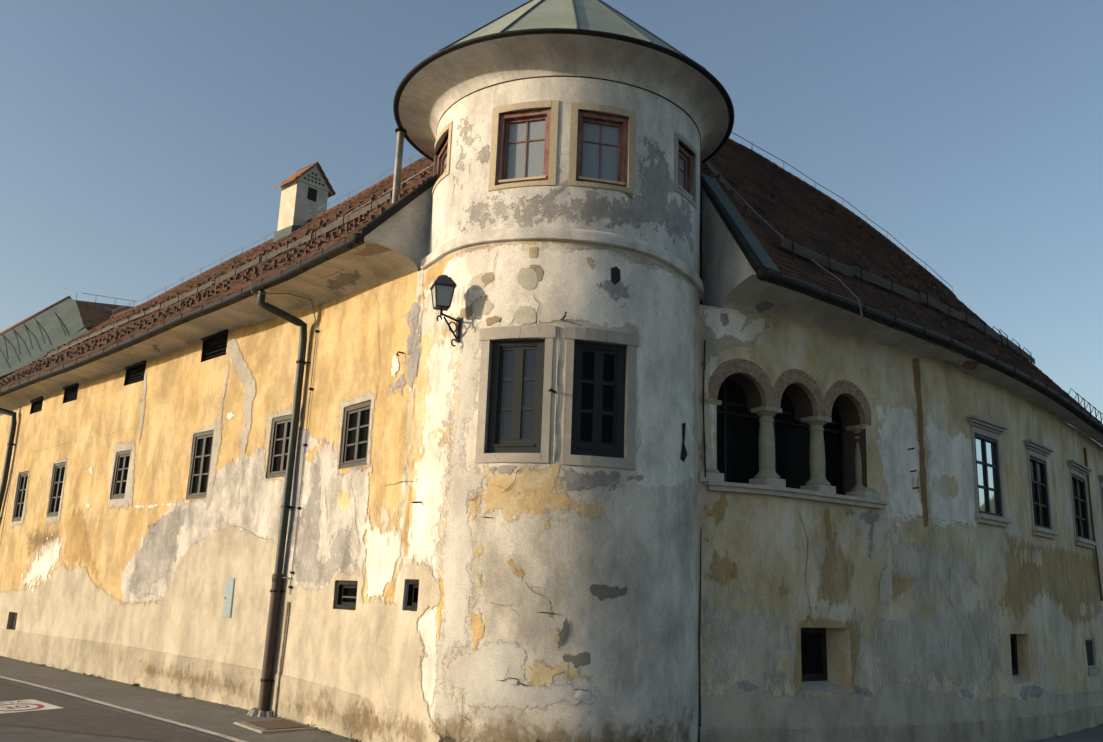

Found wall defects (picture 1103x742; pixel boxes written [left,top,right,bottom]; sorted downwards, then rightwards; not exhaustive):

spalling [476,145,490,163]
peeling [121,241,774,707]
peeling [872,394,979,530]
peeling [21,531,65,593]
leakage [144,666,251,698]
leakage [296,693,690,742]